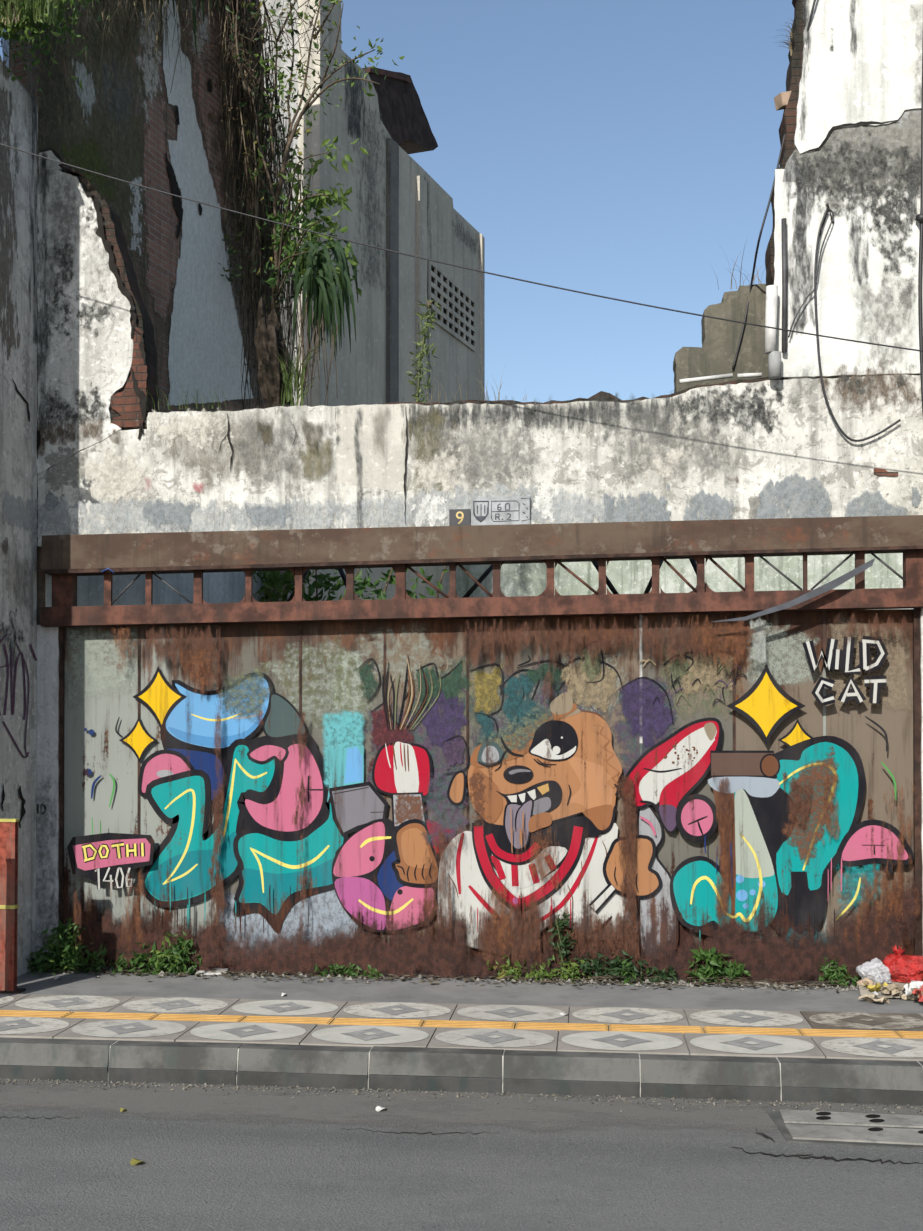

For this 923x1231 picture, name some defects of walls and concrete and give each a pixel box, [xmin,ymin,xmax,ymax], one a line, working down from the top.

leakage [25,33,114,377]
flaking render [129,3,182,324]
flaking render [181,0,226,223]
leakage [785,133,921,411]
peeling [791,110,921,212]
leakage [39,387,112,444]
crack [219,414,233,471]
leakage [354,409,384,528]
peeling [38,327,921,535]
leakage [409,354,803,492]
corrosion [56,613,923,986]
crack [730,1130,920,1164]